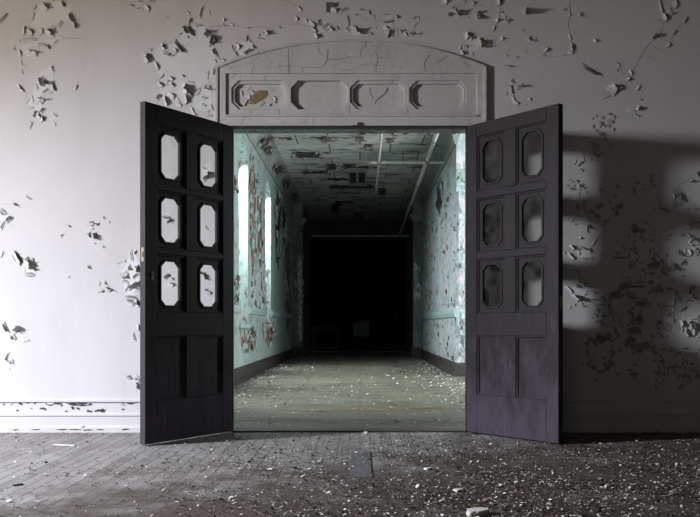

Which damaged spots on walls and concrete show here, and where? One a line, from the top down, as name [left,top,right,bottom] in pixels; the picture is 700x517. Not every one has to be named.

peeling [17,65,57,129]
peeling [12,0,77,75]
peeling [143,6,225,117]
crack [226,42,408,115]
crack [614,0,689,81]
peeling [0,250,36,277]
peeling [115,248,140,307]
peeling [234,154,270,309]
peeling [413,167,465,310]
peeling [565,171,700,390]
peeling [425,318,465,363]
peeling [3,402,106,413]